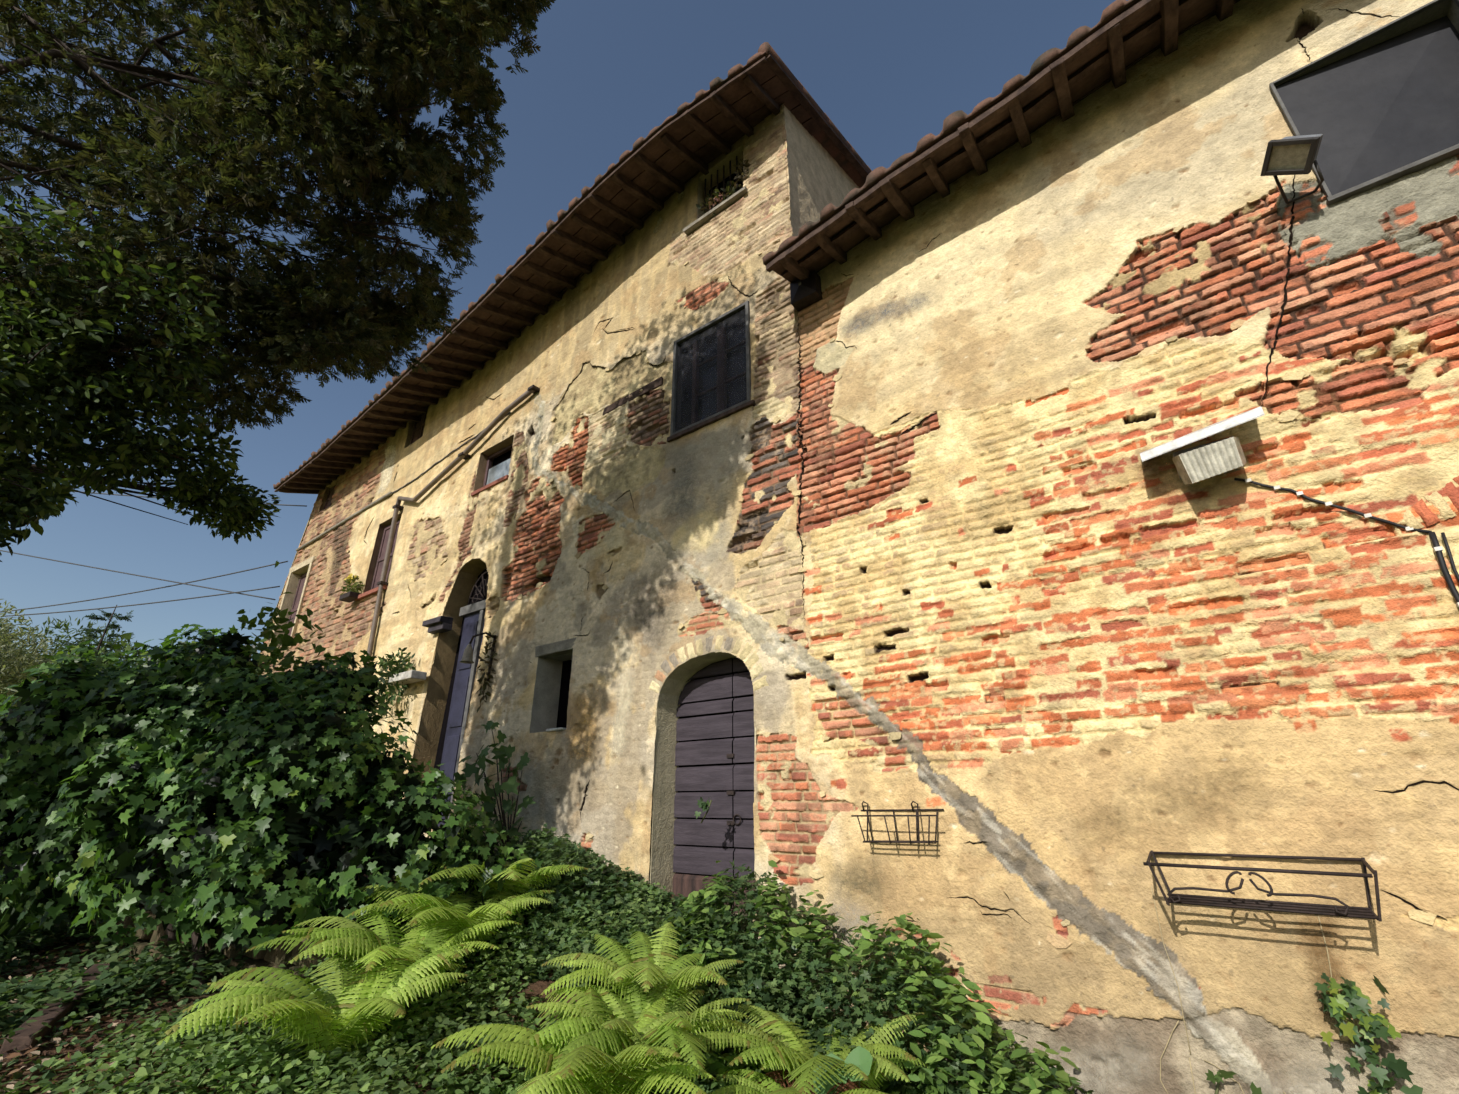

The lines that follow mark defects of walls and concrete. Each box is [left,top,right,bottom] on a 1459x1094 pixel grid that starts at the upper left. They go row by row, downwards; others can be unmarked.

crack [1297,8,1399,62]
flaking render [667,103,793,311]
crack [555,317,666,407]
crack [1260,175,1295,407]
flaking render [486,349,676,618]
flaking render [677,182,1459,772]
flaking render [755,732,859,886]
crack [1374,776,1459,793]
crack [1381,889,1448,920]